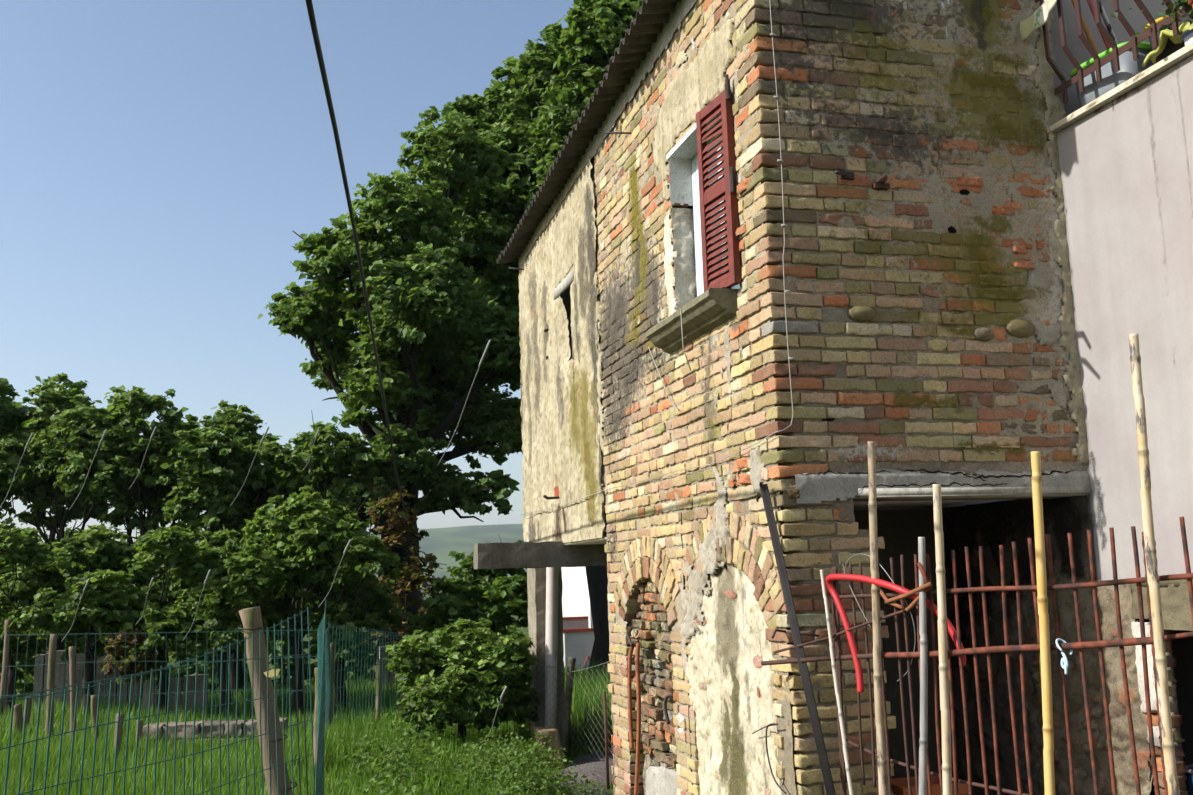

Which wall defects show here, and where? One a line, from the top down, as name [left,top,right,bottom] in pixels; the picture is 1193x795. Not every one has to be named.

peeling [653,18,735,317]
water stain [635,223,657,326]
water stain [526,186,639,524]
spalling [729,457,751,488]
peeling [680,617,706,674]